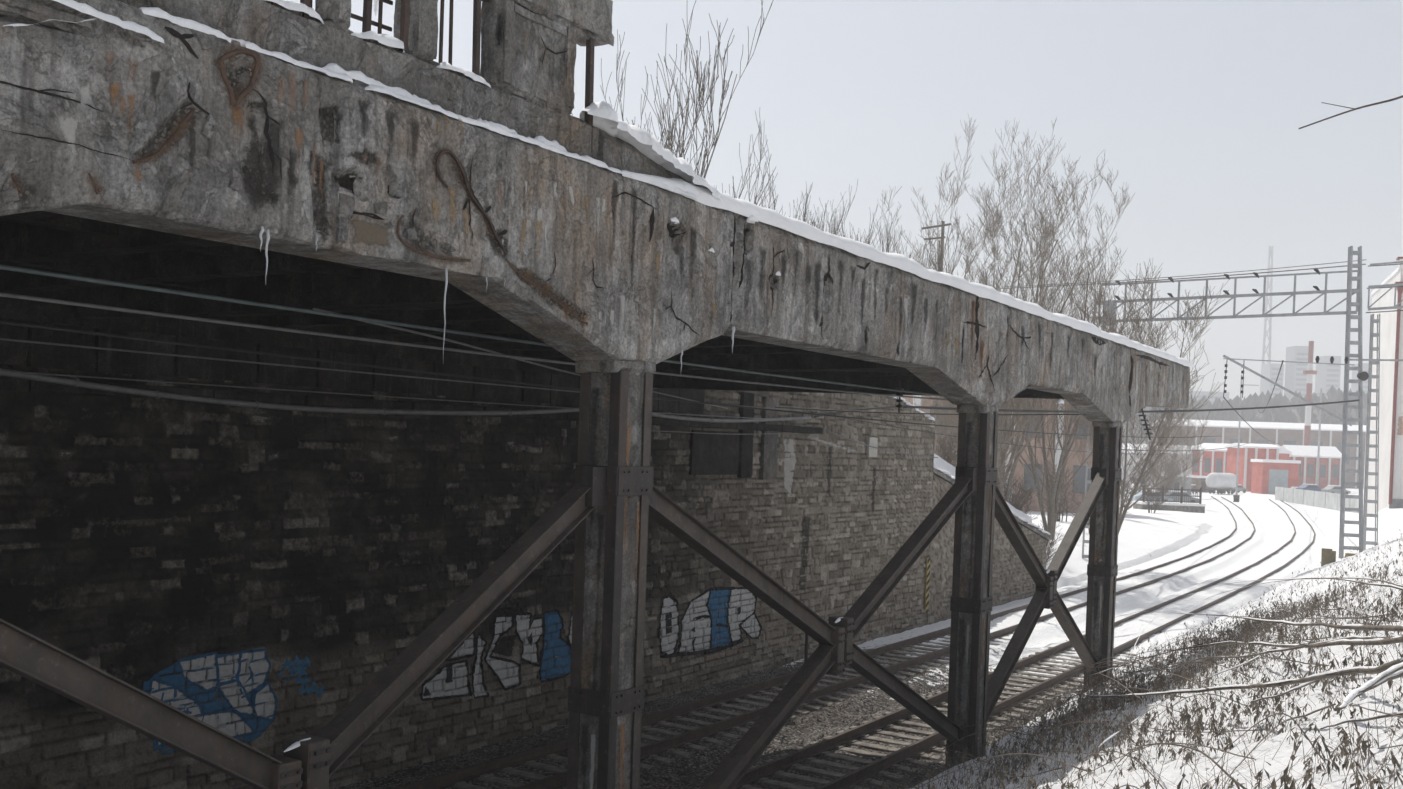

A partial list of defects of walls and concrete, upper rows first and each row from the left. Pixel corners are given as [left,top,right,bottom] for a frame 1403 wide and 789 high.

crack [0,81,103,112]
crack [3,130,133,161]
spalling [132,103,218,164]
damp [245,122,296,209]
spalling [434,149,588,325]
crack [962,296,1031,390]